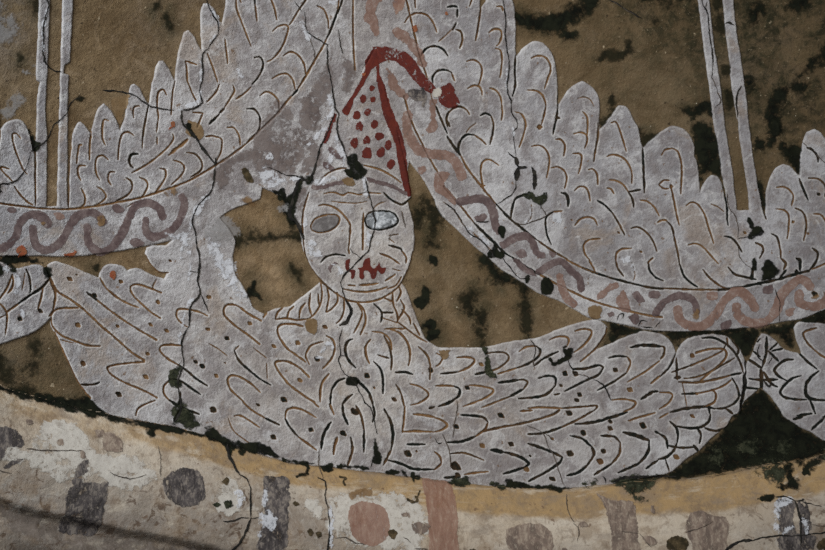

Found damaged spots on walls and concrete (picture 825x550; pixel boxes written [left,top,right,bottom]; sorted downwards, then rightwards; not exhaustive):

water stain [597,39,633,62]
water stain [178,60,202,111]
crack [498,1,546,225]
water stain [726,89,734,110]
crack [103,0,219,422]
water stain [413,197,444,248]
crack [338,178,406,433]
peeling [2,419,158,492]
peeling [213,477,243,517]
peeling [293,476,430,550]
spalling [642,535,689,550]
crack [725,495,825,550]